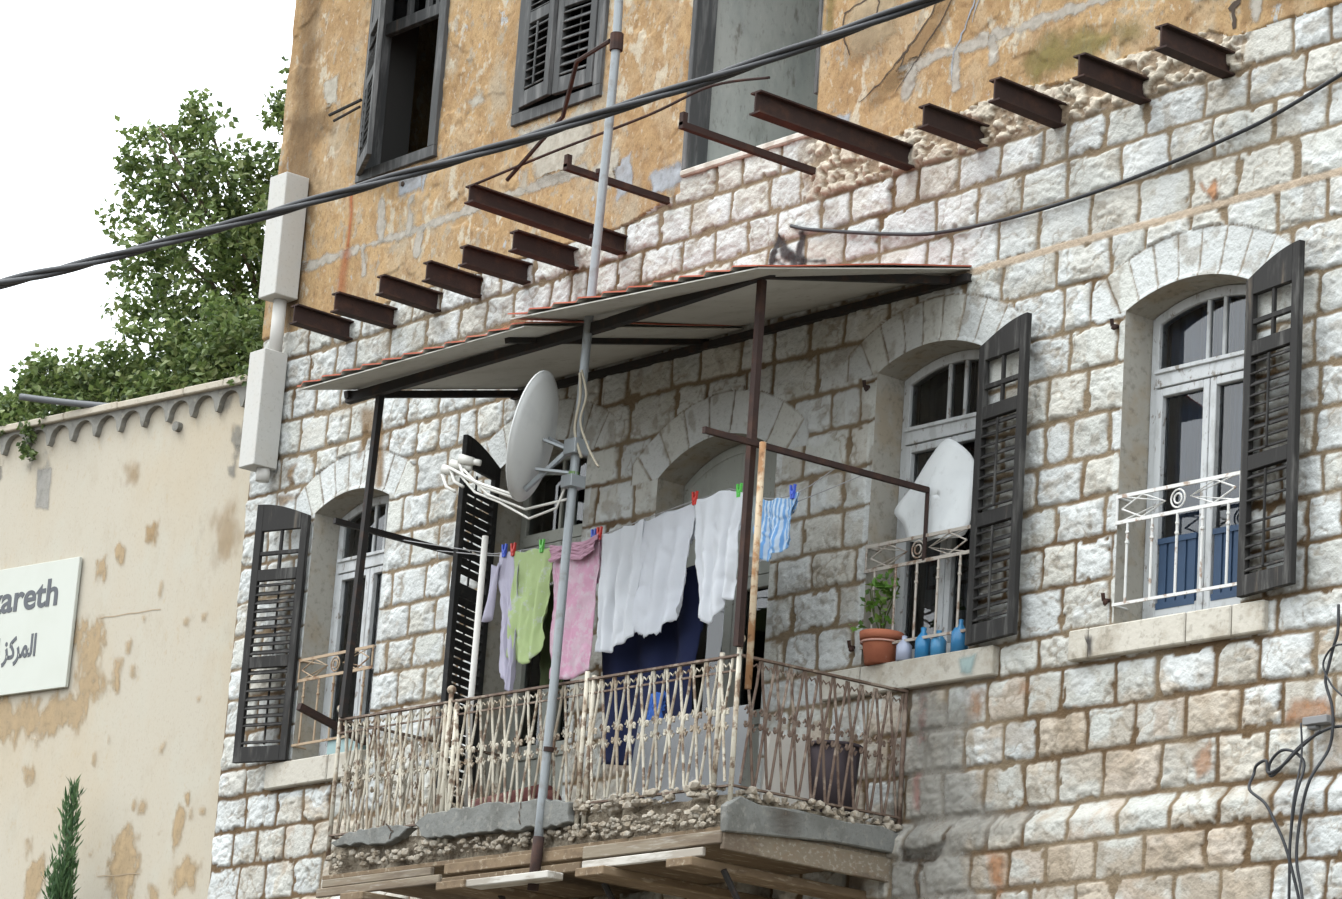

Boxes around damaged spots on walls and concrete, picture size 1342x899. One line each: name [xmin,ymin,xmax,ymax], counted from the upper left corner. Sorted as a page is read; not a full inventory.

crack [842,0,880,55]
crack [860,0,979,102]
flaking render [897,0,1109,100]
flaking render [1250,0,1262,21]
flaking render [650,162,682,192]
corrosion [340,196,352,291]
peeling [96,543,125,581]
peeling [0,620,134,744]
peeling [109,802,145,899]
peeling [172,793,204,895]
spalling [326,779,903,870]